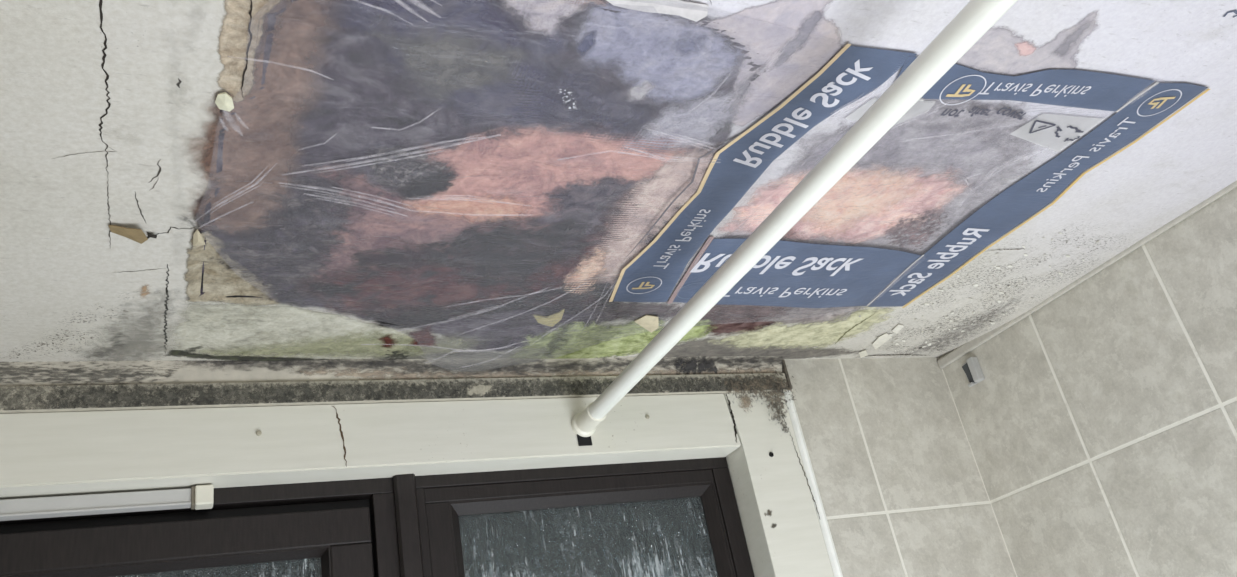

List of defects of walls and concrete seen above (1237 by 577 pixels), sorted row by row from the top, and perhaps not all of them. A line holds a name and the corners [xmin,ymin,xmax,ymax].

peeling [955,11,1098,76]
crack [53,0,196,353]
spalling [174,0,847,357]
spalling [701,99,1035,335]
damp [0,308,665,410]
damp [627,305,893,433]
peeling [856,232,1107,358]
crack [332,406,347,467]